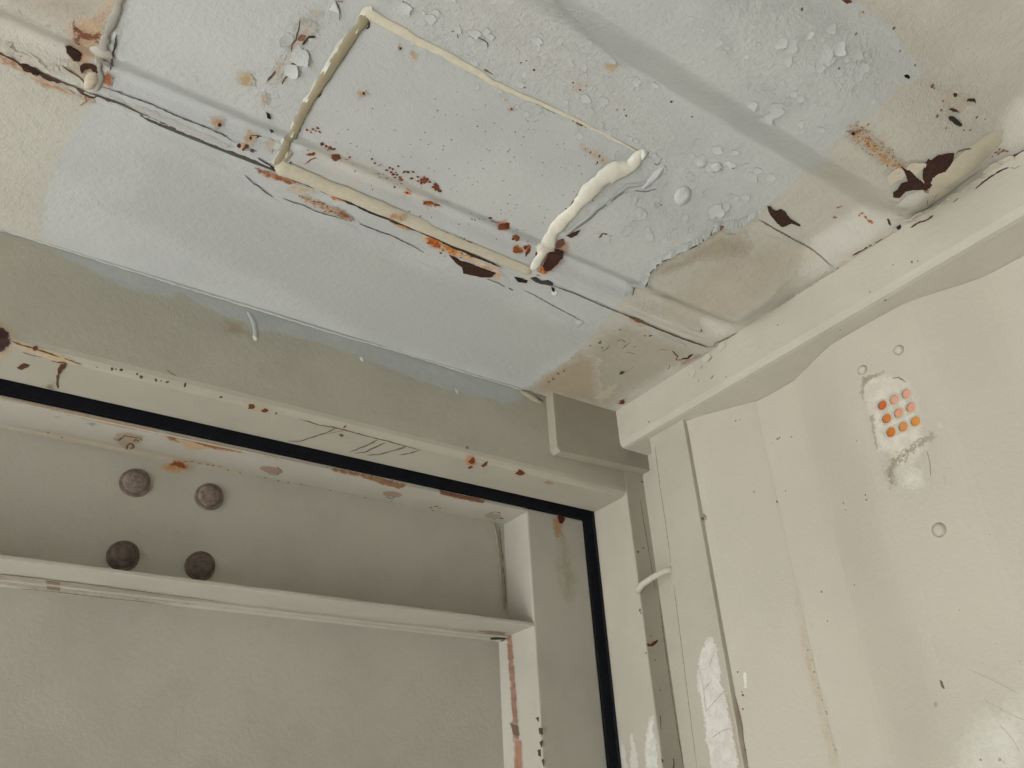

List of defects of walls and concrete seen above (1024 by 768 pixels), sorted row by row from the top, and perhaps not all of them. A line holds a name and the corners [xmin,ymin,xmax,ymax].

corrosion [254,167,357,222]
corrosion [293,127,449,218]
corrosion [451,194,531,257]
corrosion [838,119,963,200]
water stain [658,234,817,333]
corrosion [0,318,82,391]
corrosion [0,574,523,768]